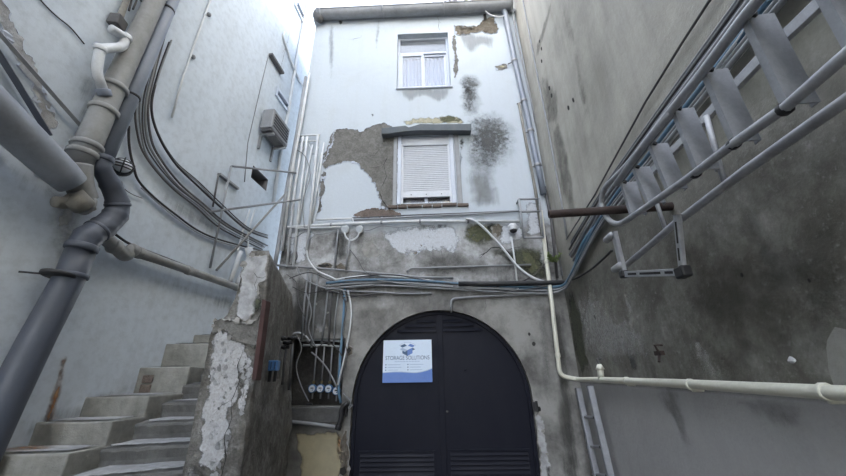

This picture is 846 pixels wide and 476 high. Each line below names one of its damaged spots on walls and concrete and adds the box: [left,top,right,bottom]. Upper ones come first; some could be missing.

flaking render [0,0,59,131]
flaking render [316,122,402,219]
flaking render [405,115,463,125]
damp [463,78,477,109]
spalling [451,13,499,78]
damp [473,119,508,162]
peeling [290,232,314,263]
corrosion [46,359,66,422]
peeling [189,252,269,476]
peeling [297,430,351,476]